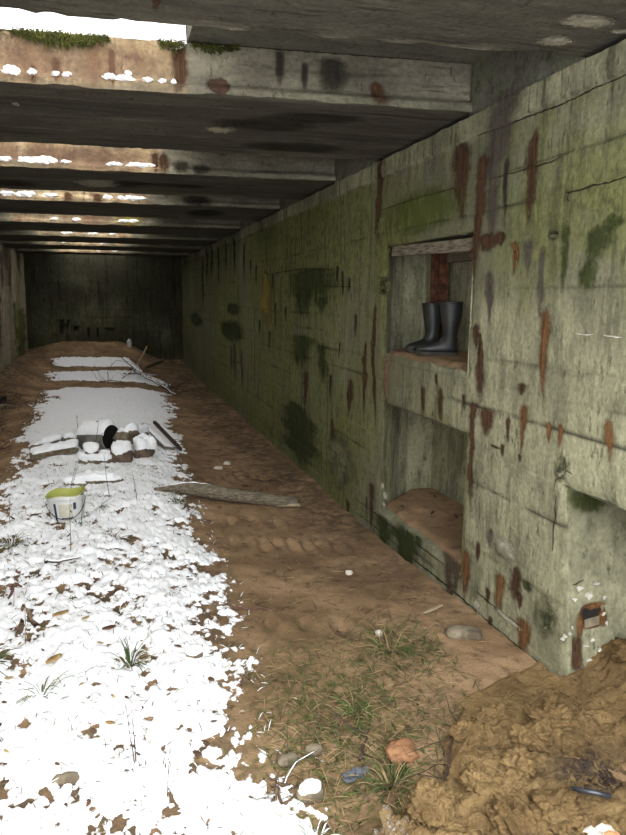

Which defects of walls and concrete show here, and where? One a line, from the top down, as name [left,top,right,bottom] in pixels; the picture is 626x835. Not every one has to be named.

leakage [276,52,284,79]
leakage [321,58,345,91]
crack [477,74,626,136]
corrosion [452,143,519,275]
corrosion [526,131,539,221]
crack [566,176,626,201]
corrosion [472,324,484,394]
corrosion [539,310,551,396]
corrosion [462,395,495,496]
corrosion [518,406,528,462]
corrosion [604,421,613,459]
peeling [571,582,607,602]